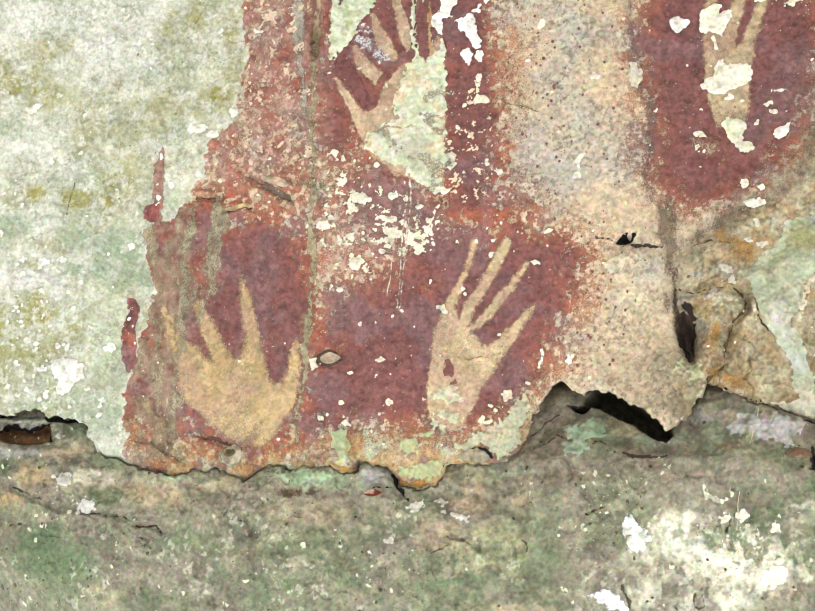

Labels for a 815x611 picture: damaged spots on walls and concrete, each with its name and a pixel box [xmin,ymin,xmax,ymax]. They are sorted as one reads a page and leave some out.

peeling [323,0,343,33]
peeling [431,0,489,65]
peeling [670,3,732,50]
peeling [451,73,491,115]
peeling [700,59,753,102]
peeling [721,118,759,153]
peeling [773,122,790,139]
spalling [438,113,504,203]
spalling [305,139,444,280]
crack [0,416,99,451]
crack [531,414,567,449]
crack [592,440,667,459]